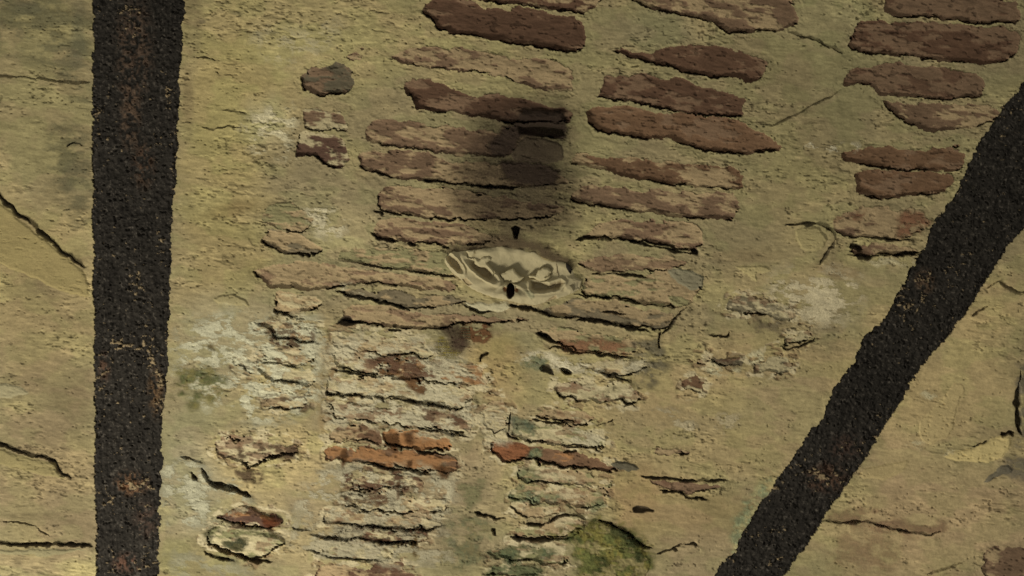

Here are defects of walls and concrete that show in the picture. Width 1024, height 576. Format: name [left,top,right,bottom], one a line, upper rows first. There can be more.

crack [0,193,84,267]
flaking render [196,0,823,576]
crack [0,442,72,479]